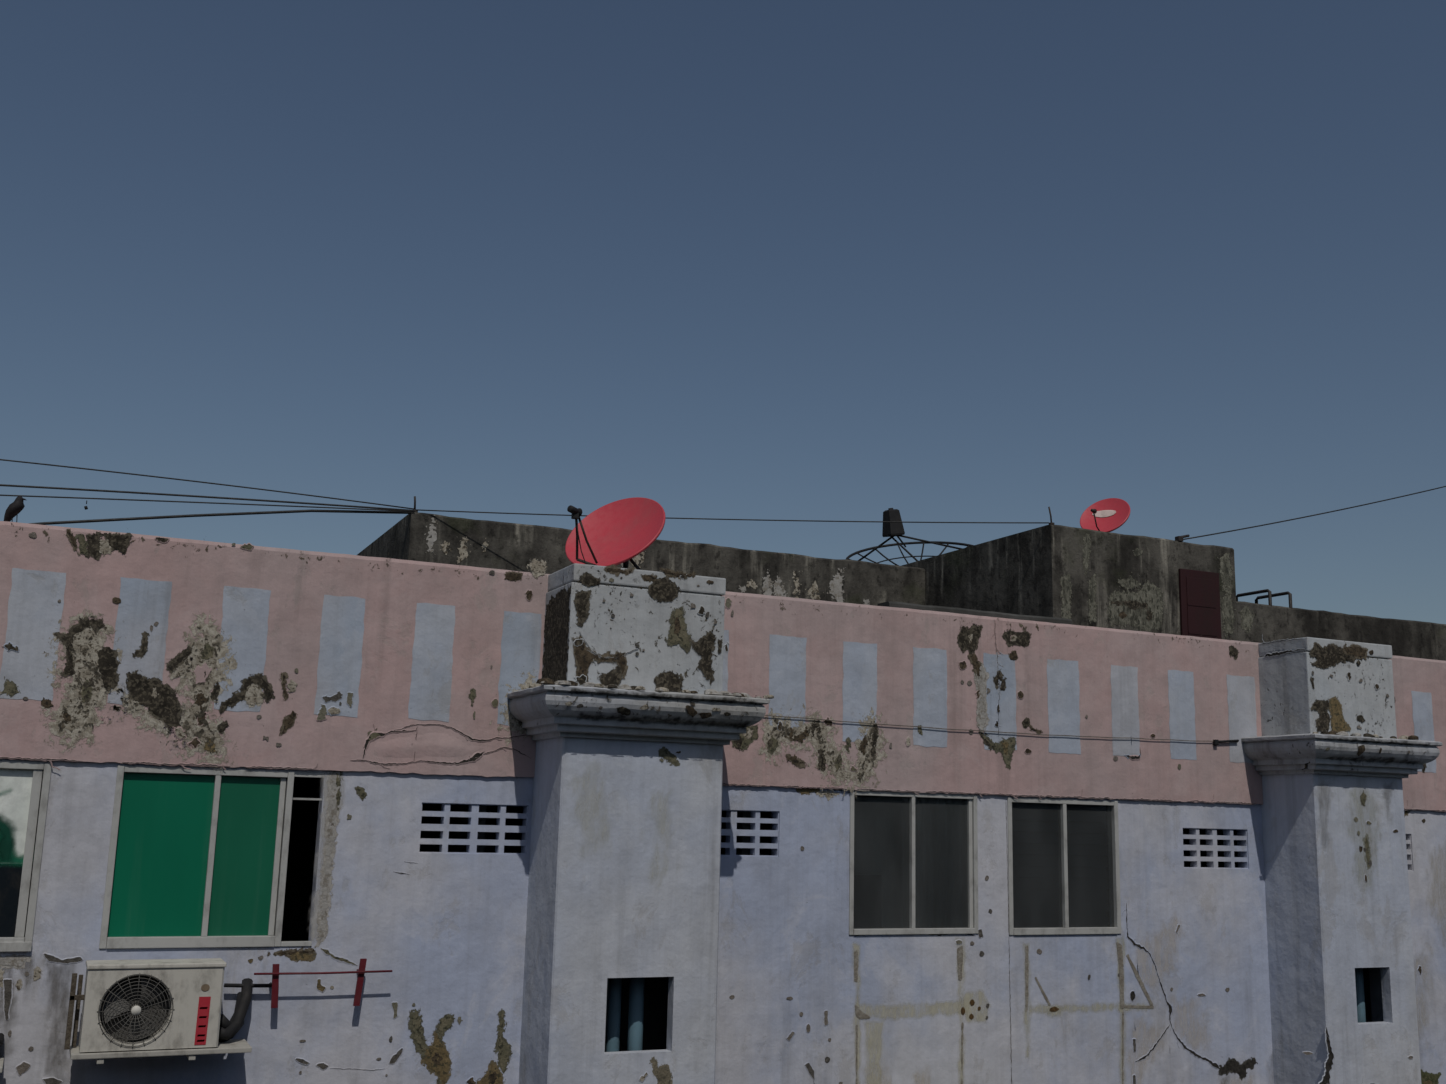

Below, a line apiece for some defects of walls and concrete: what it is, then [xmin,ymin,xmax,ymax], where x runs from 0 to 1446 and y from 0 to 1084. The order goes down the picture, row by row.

spalling [65,529,133,561]
spalling [573,551,846,686]
spalling [0,599,298,773]
crack [122,723,531,770]
spalling [654,670,731,719]
peeling [732,703,923,801]
peeling [957,624,1045,770]
crack [1124,736,1141,761]
spalling [1309,642,1396,756]
crack [722,783,1257,1084]
peeling [376,1001,512,1084]
crack [1318,1026,1375,1084]